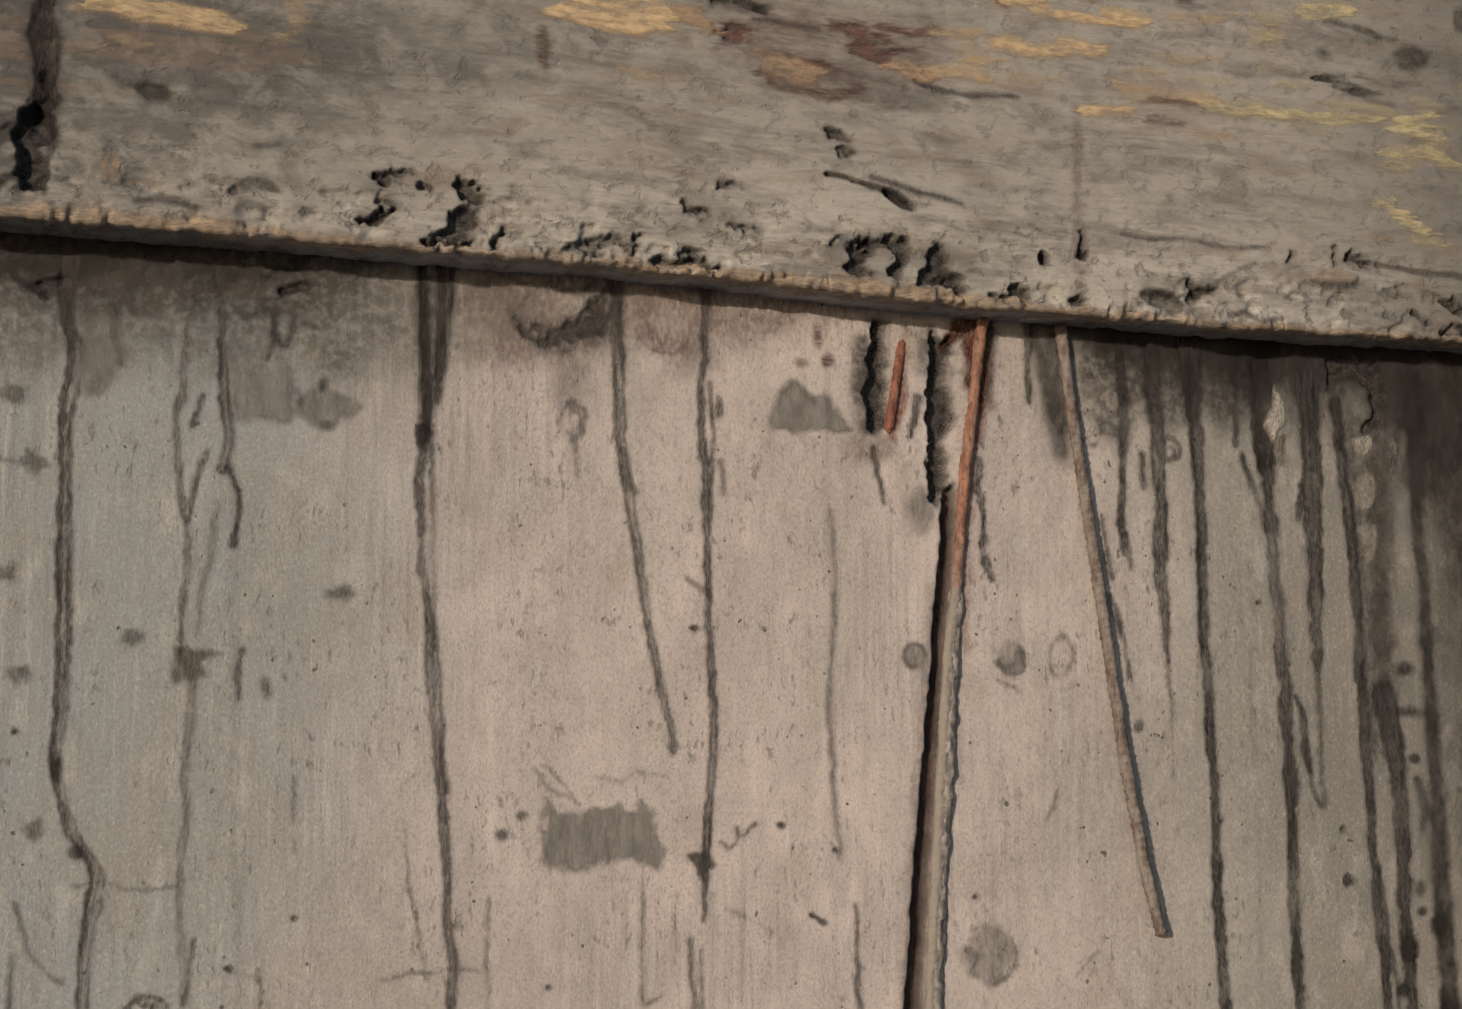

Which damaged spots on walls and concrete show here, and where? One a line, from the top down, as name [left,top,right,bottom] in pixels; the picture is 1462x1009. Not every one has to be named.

crack [28,0,60,108]
crack [21,237,101,1009]
rust [941,318,995,438]
crack [975,457,994,582]
spalling [1054,323,1167,936]
water stain [1024,323,1462,1009]